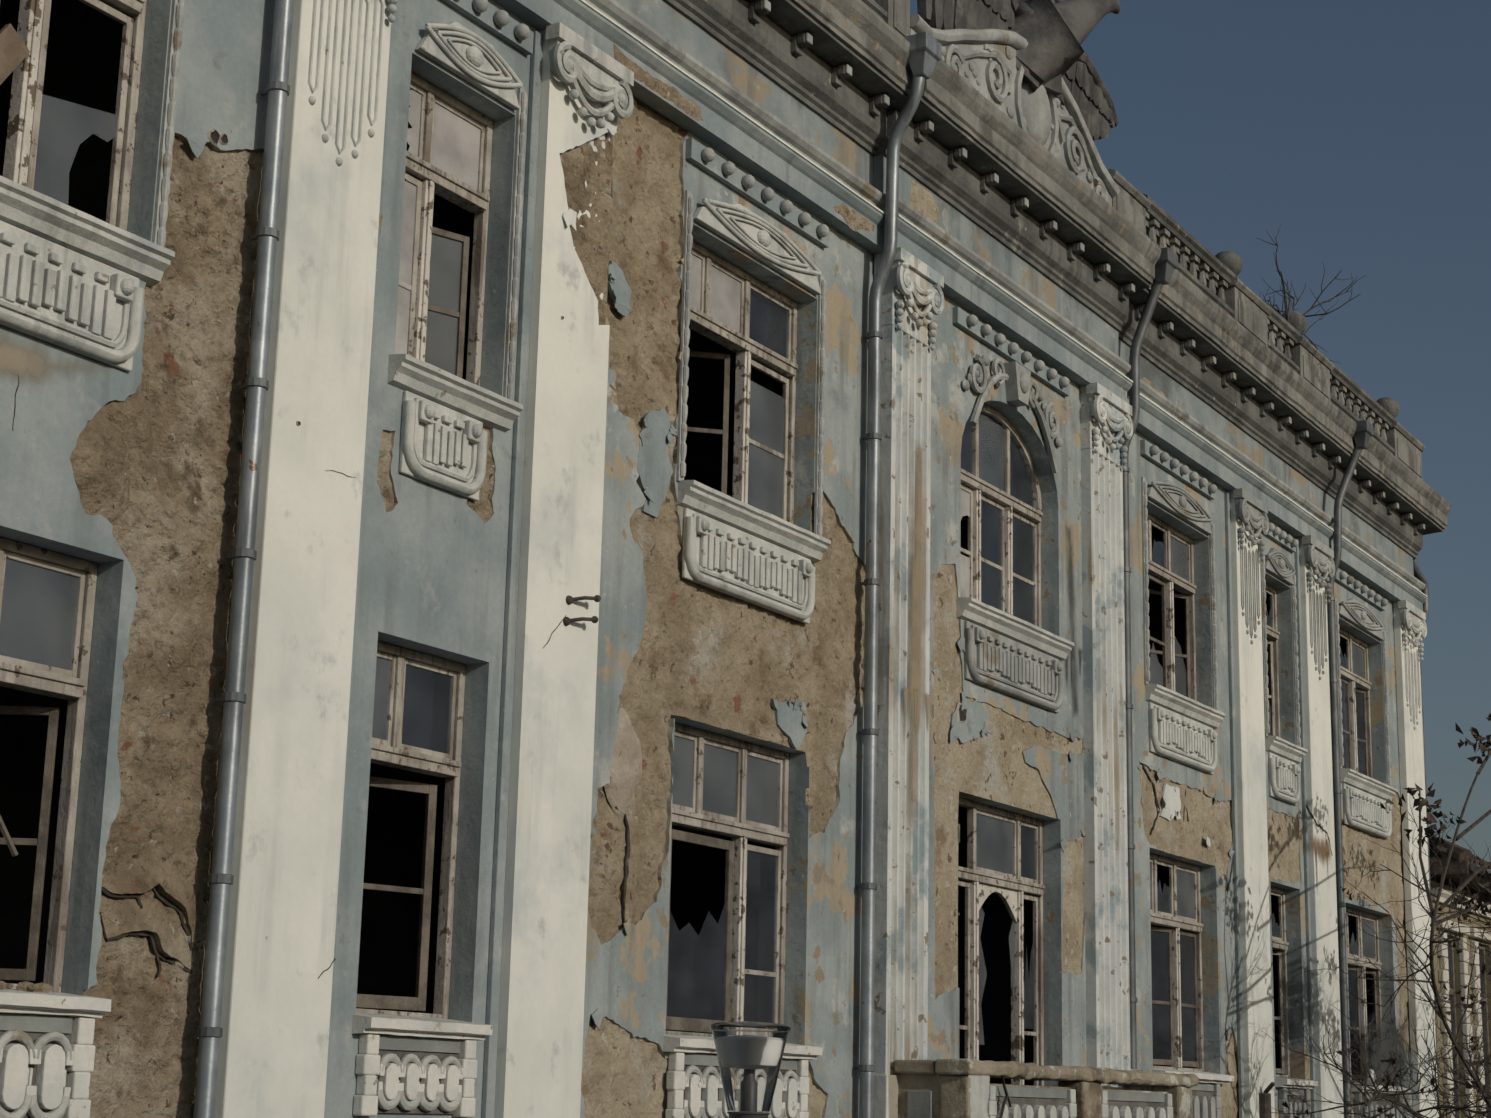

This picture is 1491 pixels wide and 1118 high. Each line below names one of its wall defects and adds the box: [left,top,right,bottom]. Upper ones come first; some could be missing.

peeling [187,128,228,159]
peeling [563,209,577,231]
peeling [608,260,632,318]
peeling [607,369,616,391]
peeling [637,408,678,518]
peeling [933,691,992,744]
peeling [1138,765,1181,821]
crack [1140,763,1189,835]
crack [100,854,207,978]